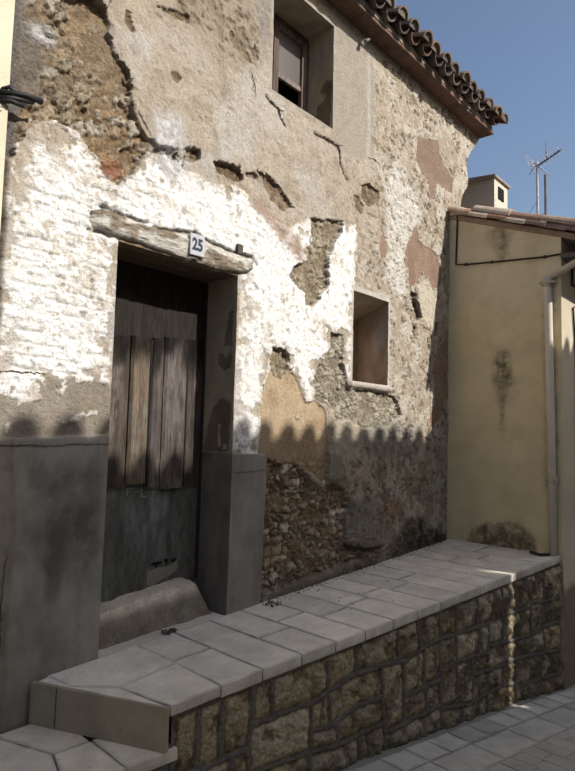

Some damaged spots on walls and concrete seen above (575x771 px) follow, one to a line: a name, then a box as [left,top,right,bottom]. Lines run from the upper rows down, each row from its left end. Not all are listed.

flaking render [5,0,201,186]
crack [250,69,285,126]
flaking render [213,160,295,211]
crack [314,133,347,180]
flaking render [289,217,345,308]
peeling [405,226,441,336]
crack [0,440,111,448]
flaking render [204,398,231,452]
peeling [257,332,402,483]
peeling [429,323,448,429]
damp [471,523,535,550]
crack [0,548,8,646]